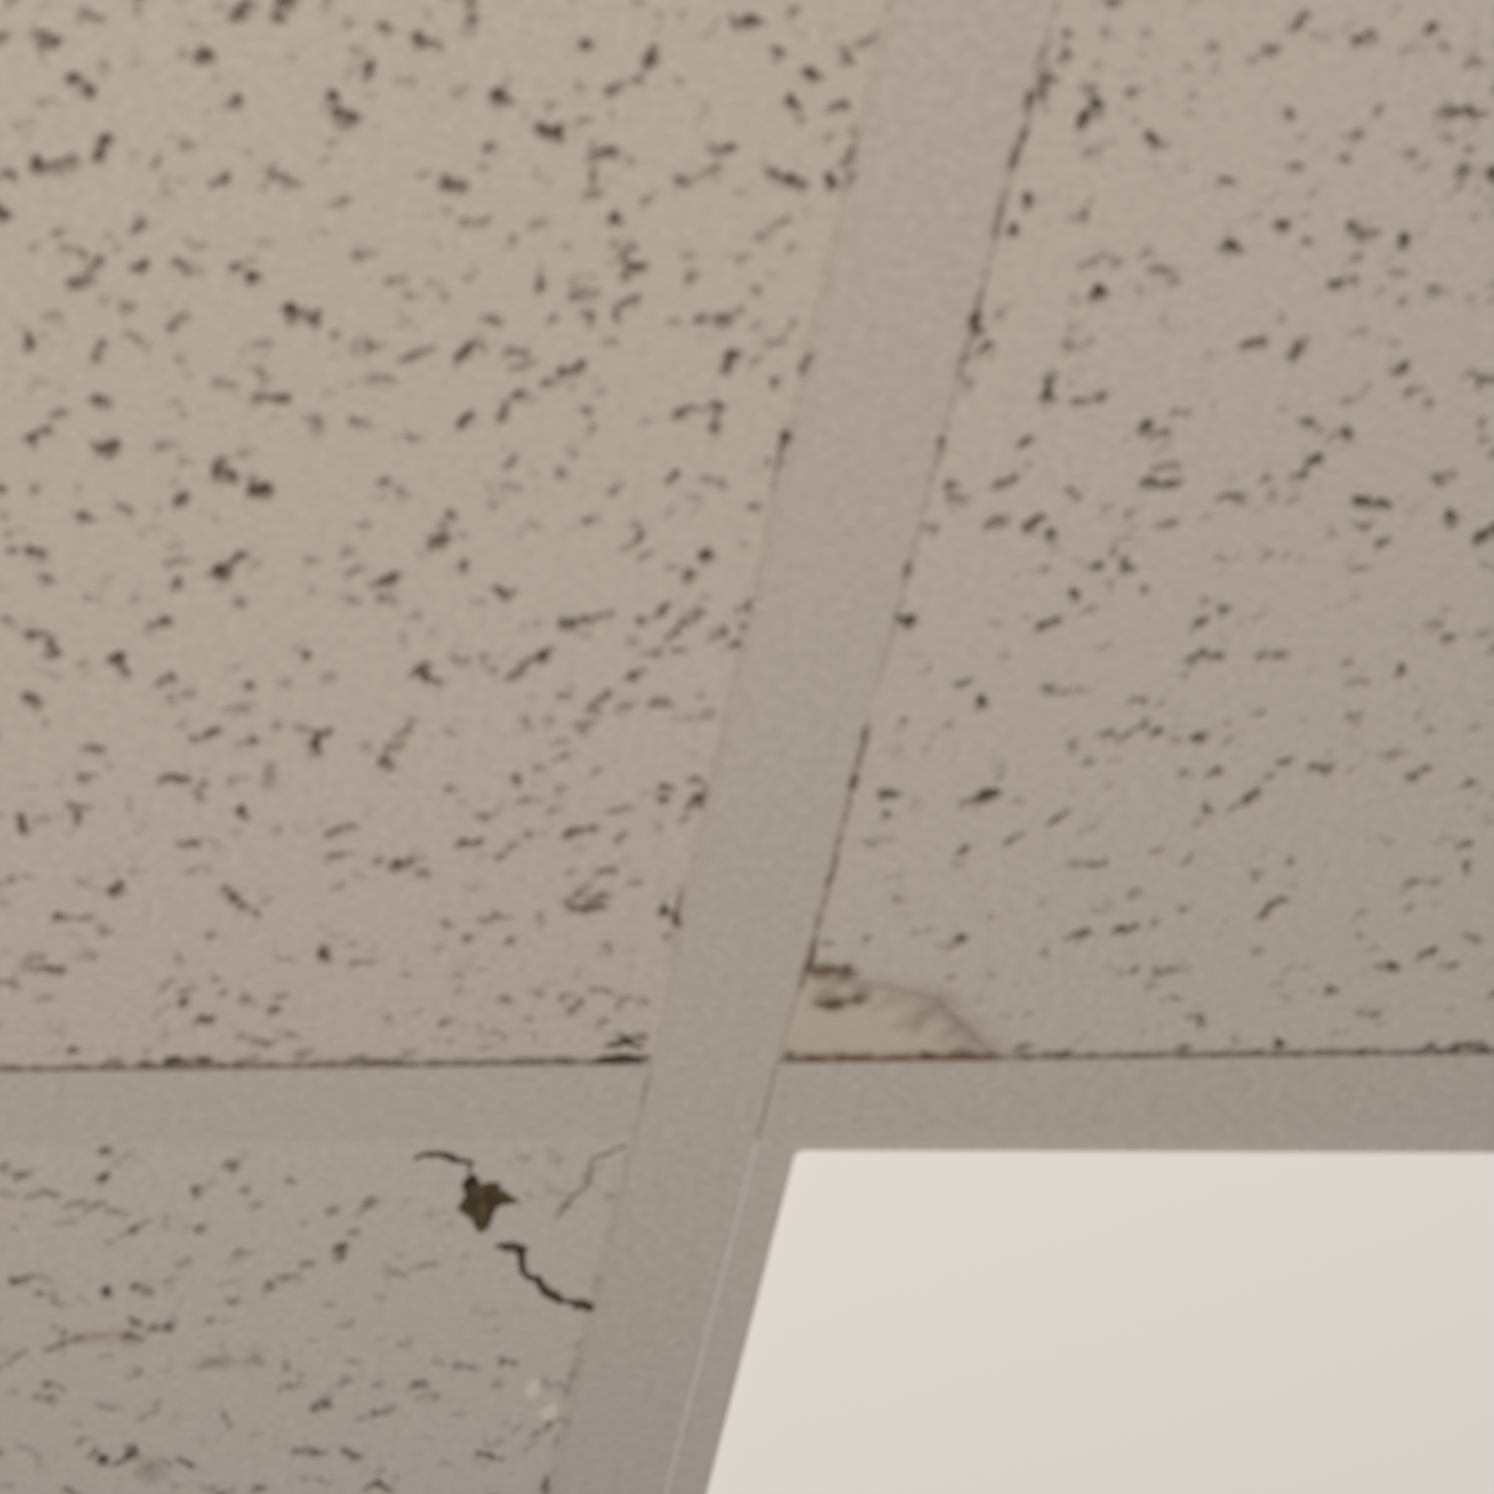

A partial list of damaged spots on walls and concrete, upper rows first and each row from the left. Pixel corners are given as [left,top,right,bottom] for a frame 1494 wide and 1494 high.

water stain [787,1053,993,1063]
crack [556,1144,631,1221]
crack [414,1152,594,1312]